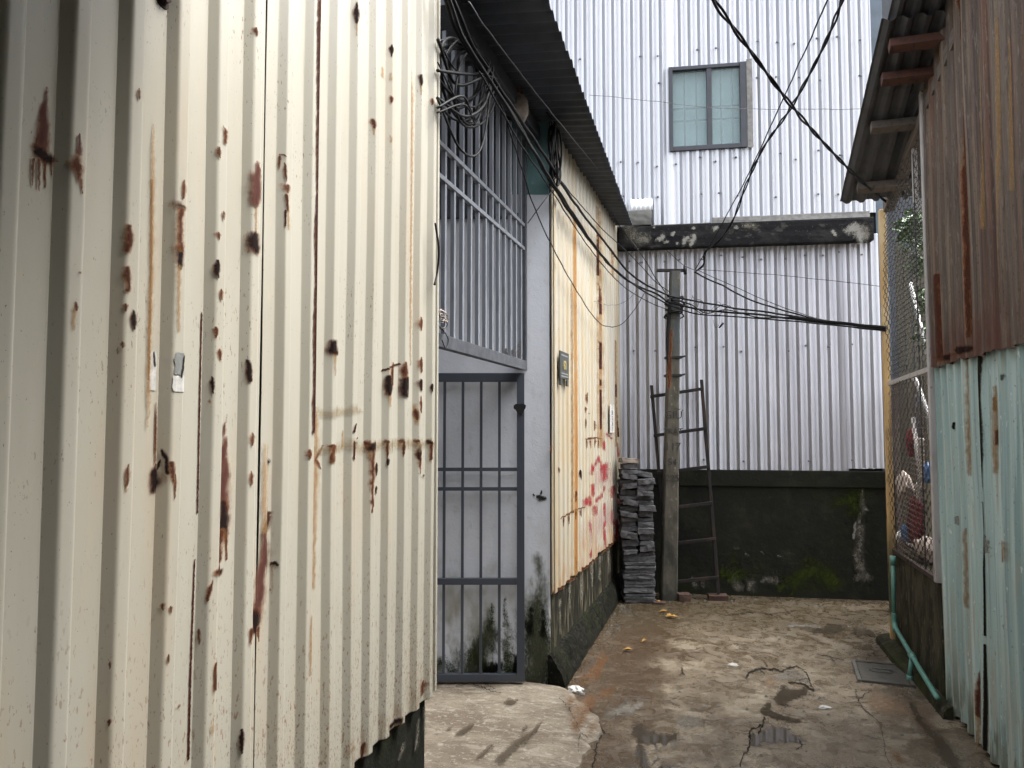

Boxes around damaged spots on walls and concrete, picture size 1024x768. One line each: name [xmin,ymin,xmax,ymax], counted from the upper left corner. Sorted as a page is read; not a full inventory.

corrosion [172,179,186,331]
corrosion [246,161,262,254]
corrosion [306,0,434,588]
corrosion [923,0,1024,475]
corrosion [197,312,222,513]
corrosion [552,208,619,594]
corrosion [178,422,231,760]
corrosion [249,463,279,644]
leakage [525,552,609,685]
crack [740,716,765,767]
crack [746,654,843,691]
leakage [852,489,871,581]